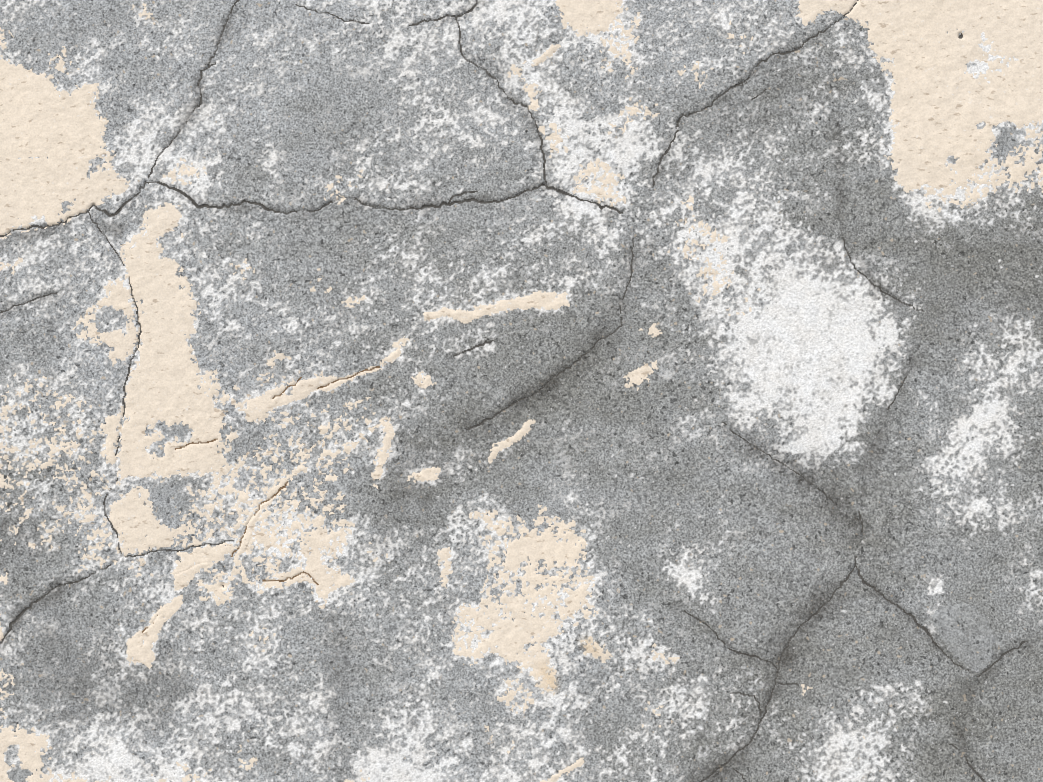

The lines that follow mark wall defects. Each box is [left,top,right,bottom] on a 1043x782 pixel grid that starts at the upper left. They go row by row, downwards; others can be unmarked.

peeling [0,27,130,239]
crack [652,0,859,188]
peeling [795,0,1043,212]
peeling [0,202,410,669]
crack [0,0,634,644]
peeling [423,291,570,324]
crack [722,422,834,503]
crack [843,237,925,312]
crack [887,376,907,410]
peeling [0,668,119,782]
peeling [451,504,599,714]
crack [684,511,1028,782]